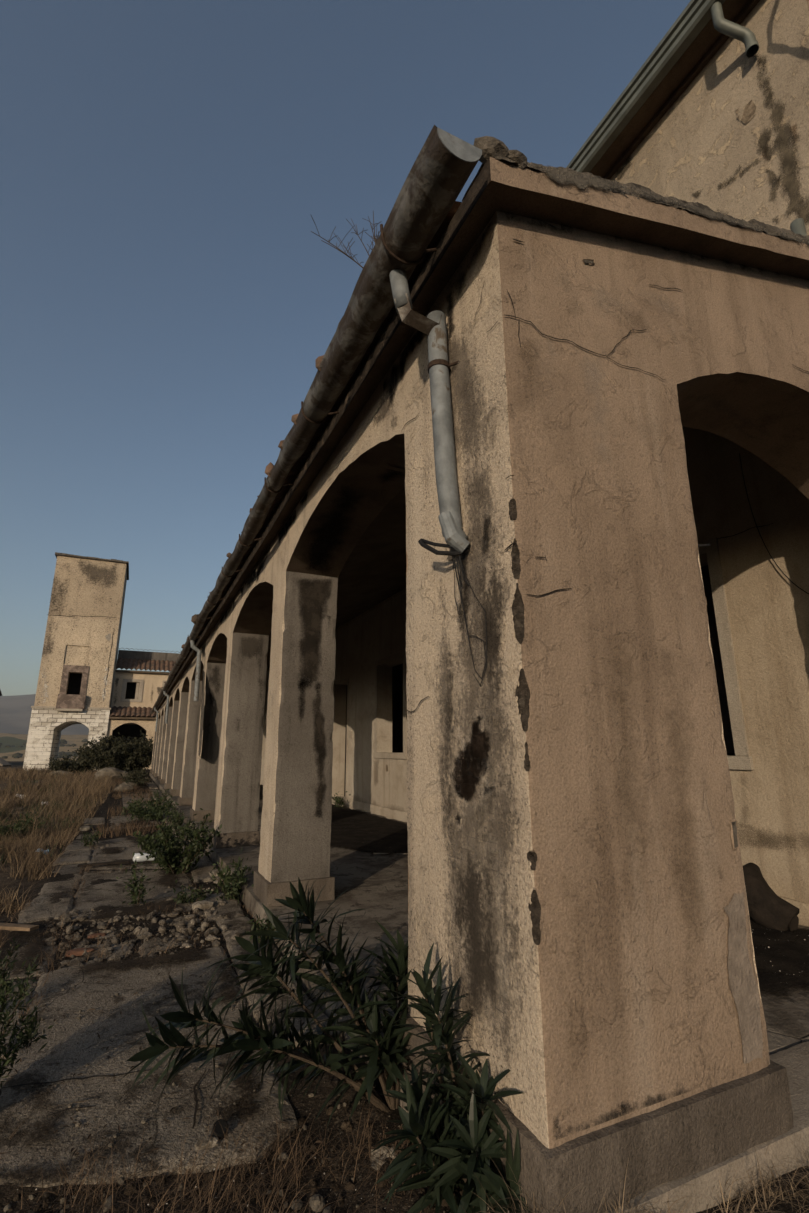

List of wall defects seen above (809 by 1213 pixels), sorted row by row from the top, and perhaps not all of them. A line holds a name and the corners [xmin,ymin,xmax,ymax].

leakage [542,54,809,244]
spalling [735,99,756,125]
leakage [374,330,423,426]
crack [474,284,664,380]
spalling [508,499,517,521]
spalling [510,538,524,643]
leakage [298,579,331,817]
leakage [437,273,522,1061]
spalling [515,669,530,771]